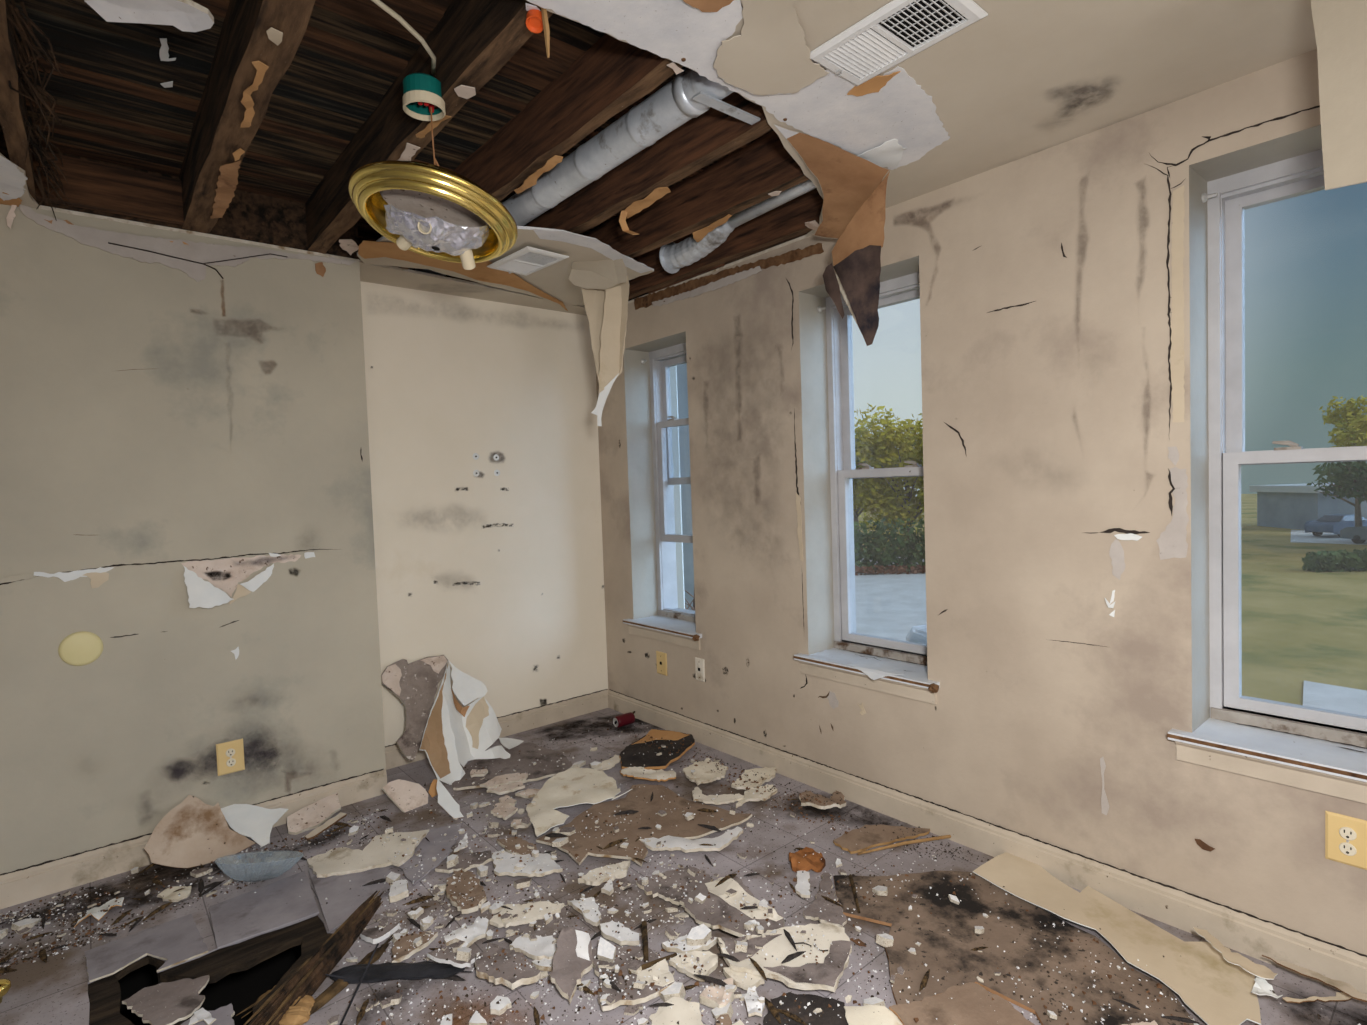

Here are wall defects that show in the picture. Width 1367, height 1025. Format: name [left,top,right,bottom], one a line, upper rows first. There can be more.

flaking render [527,0,950,170]
crack [1146,105,1320,432]
crack [1085,528,1150,541]
flaking render [1156,467,1189,560]
crack [0,549,336,588]
peeling [181,554,301,608]
flaking render [382,664,402,696]